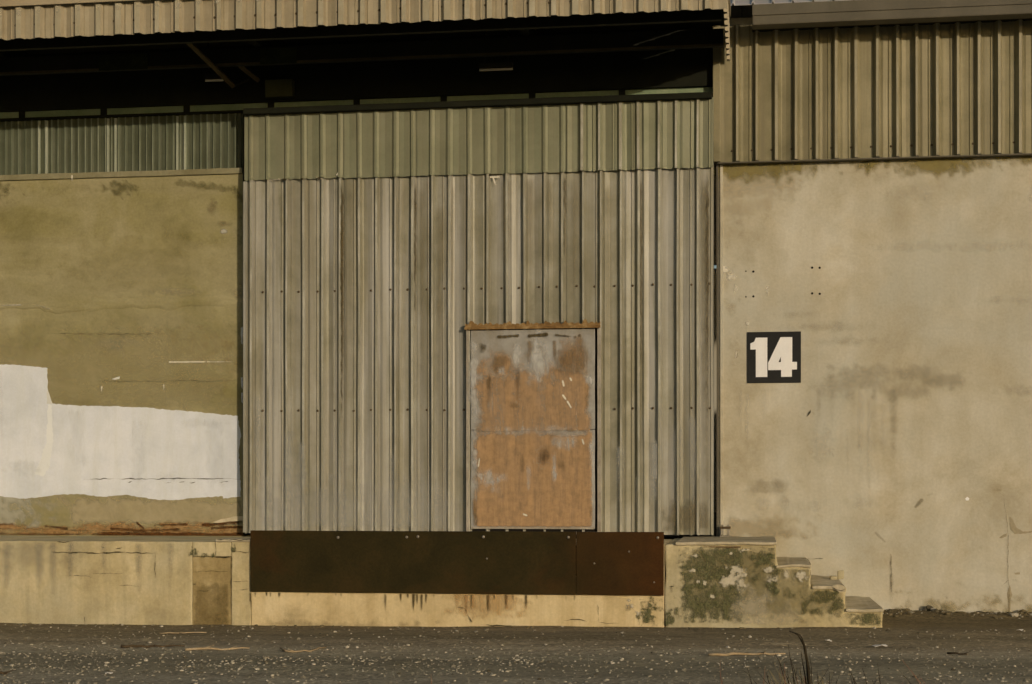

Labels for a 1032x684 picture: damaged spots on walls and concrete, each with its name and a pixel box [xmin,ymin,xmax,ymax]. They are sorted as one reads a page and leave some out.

leakage [706,160,803,342]
leakage [904,154,1032,175]
rust [474,342,592,527]
rust [0,516,243,536]